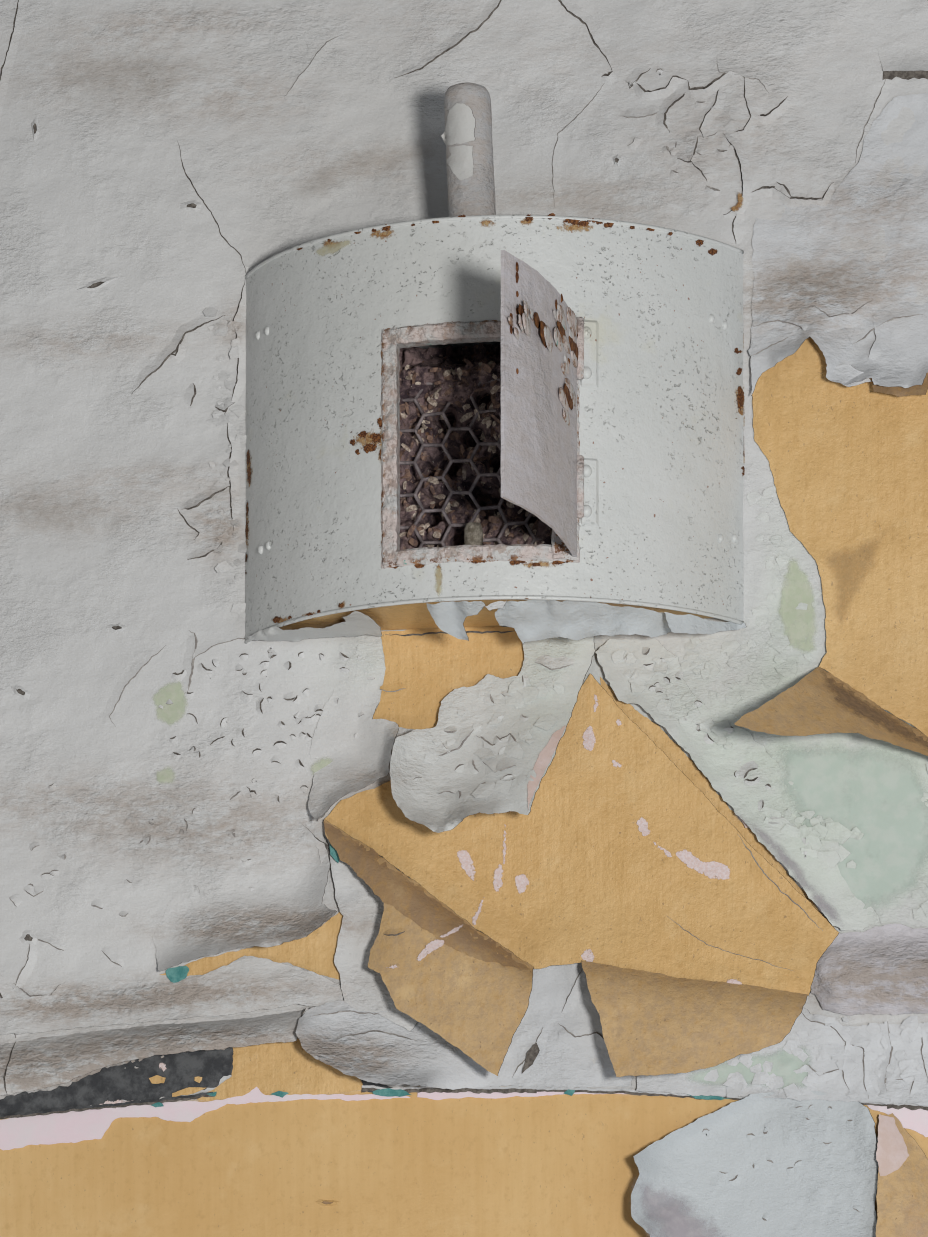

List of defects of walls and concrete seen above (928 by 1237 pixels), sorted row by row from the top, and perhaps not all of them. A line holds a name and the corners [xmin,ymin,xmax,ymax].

crack [0,0,25,120]
crack [284,35,343,99]
crack [393,0,502,78]
crack [552,0,836,244]
crack [855,79,890,163]
crack [129,140,250,560]
peeling [734,93,928,756]
peeling [0,626,928,1237]